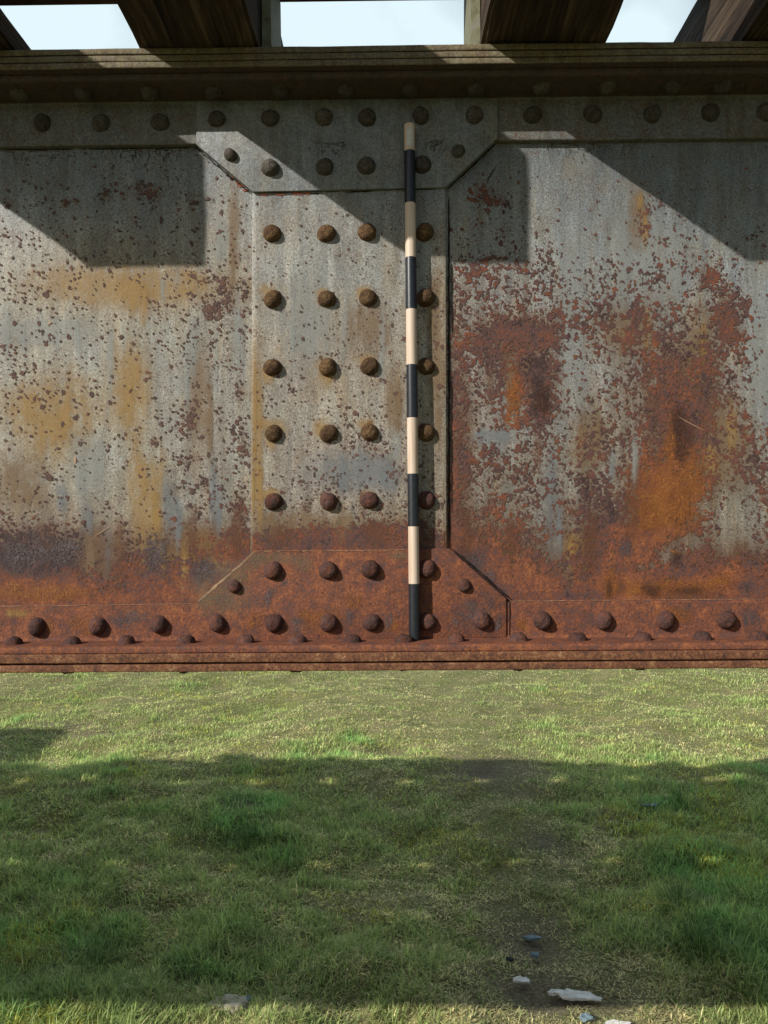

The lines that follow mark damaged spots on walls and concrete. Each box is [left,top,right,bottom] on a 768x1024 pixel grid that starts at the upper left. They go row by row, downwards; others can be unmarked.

corrosion [229,200,239,269]
corrosion [0,268,768,626]